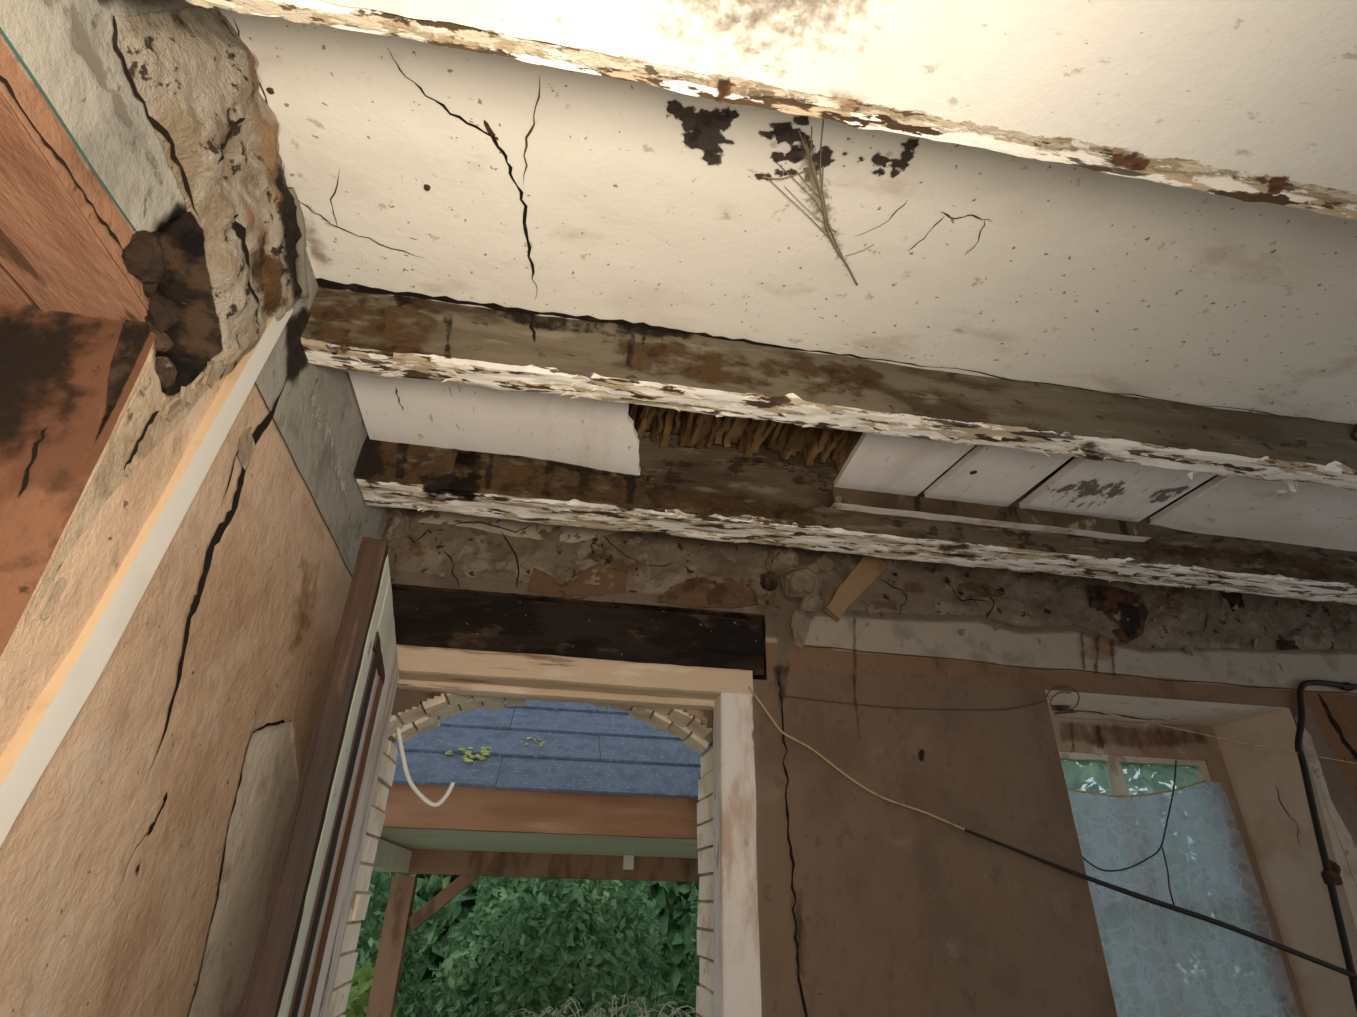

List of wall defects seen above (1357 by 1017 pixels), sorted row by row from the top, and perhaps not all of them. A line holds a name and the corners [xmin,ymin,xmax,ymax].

crack [0,75,124,252]
crack [386,47,540,342]
damp [667,99,739,165]
peeling [186,0,1357,204]
damp [755,115,919,182]
damp [0,307,100,448]
spalling [26,211,243,622]
crack [121,376,288,884]
spalling [394,505,787,609]
spalling [798,537,1357,656]
peeling [1047,453,1153,507]
crack [775,666,808,1017]